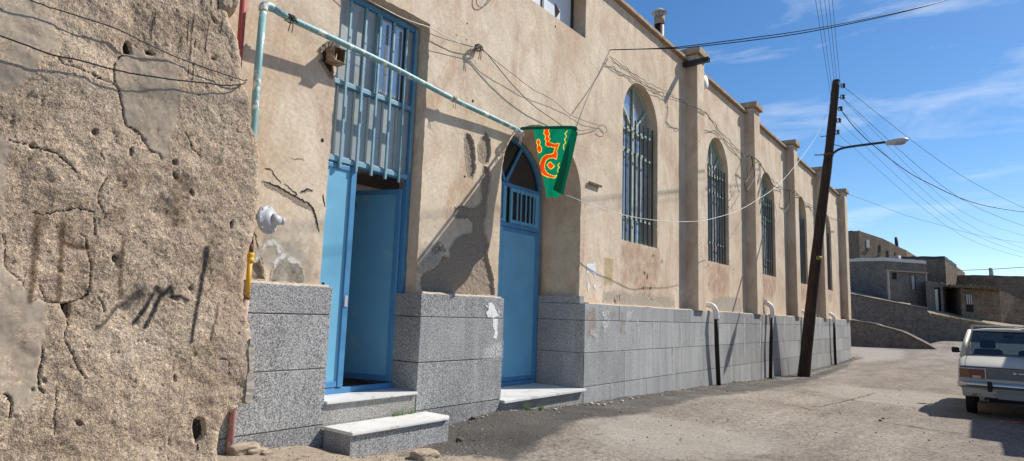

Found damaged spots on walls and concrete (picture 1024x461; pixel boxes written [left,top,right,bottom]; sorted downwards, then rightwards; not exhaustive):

crack [2,139,108,436]
crack [262,157,325,232]
flaking render [418,131,496,296]